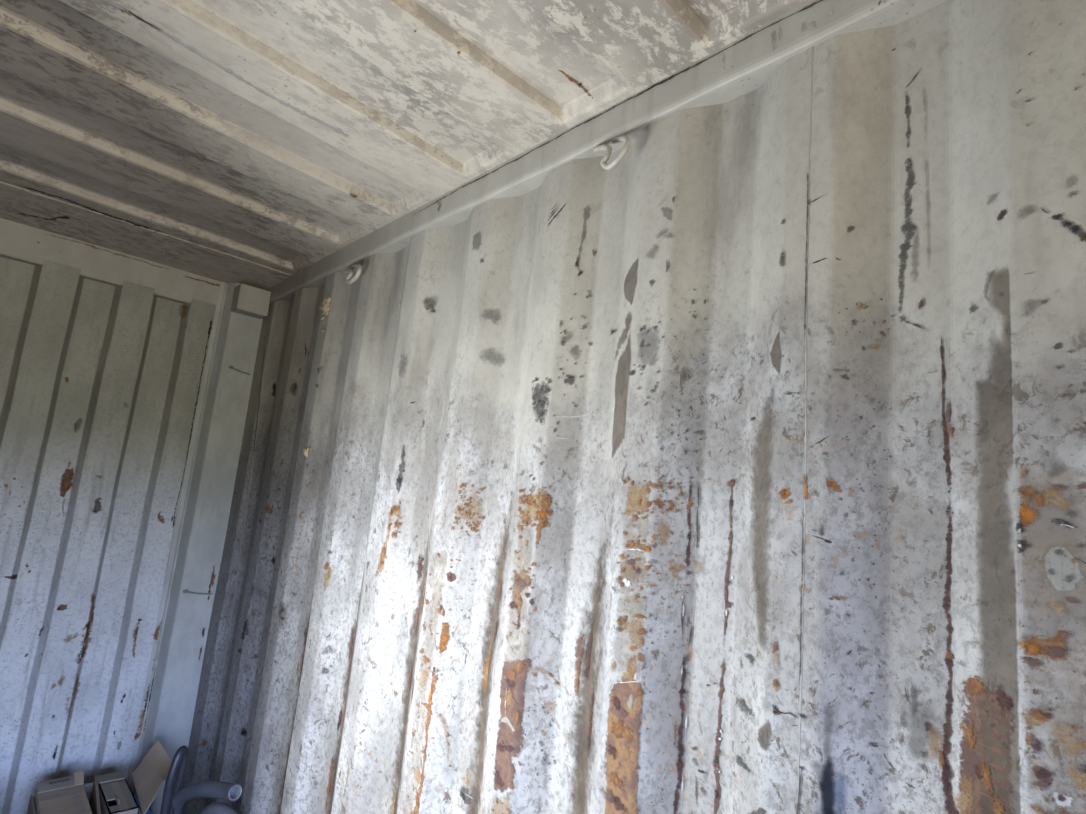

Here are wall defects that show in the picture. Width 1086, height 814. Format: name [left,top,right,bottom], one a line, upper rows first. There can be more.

rust [60,468,74,497]
rust [1018,467,1086,527]
rust [375,501,402,574]
rust [465,485,559,814]
rust [572,476,689,814]
rust [1018,625,1086,676]
rust [954,676,1086,814]